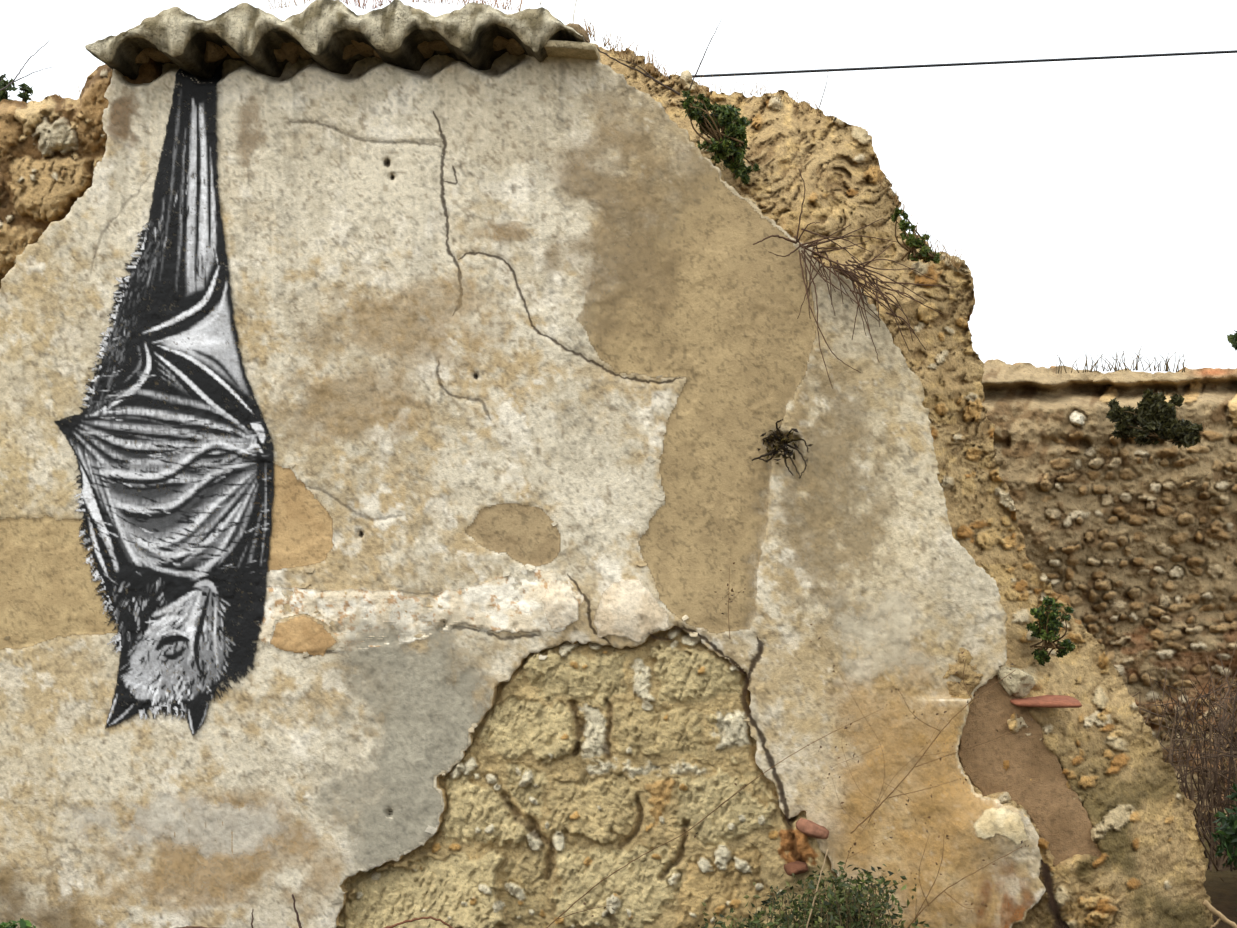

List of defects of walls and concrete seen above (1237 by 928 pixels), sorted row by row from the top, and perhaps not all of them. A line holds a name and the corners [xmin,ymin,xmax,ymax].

crack [433,111,680,384]
peeling [0,515,118,650]
flaking render [255,168,854,928]
crack [647,626,791,826]